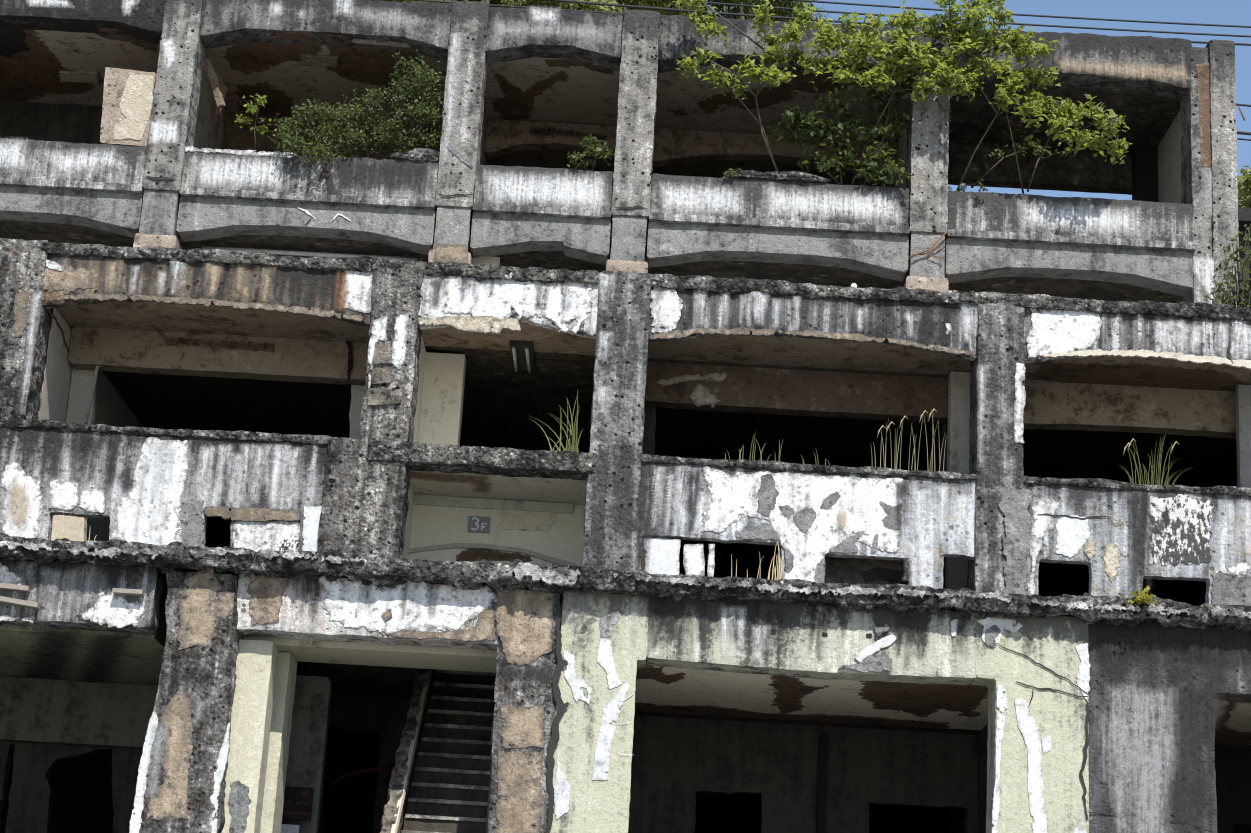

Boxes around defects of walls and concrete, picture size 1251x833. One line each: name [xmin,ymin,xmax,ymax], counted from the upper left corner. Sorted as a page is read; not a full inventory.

peeling [343,243,595,406]
water stain [12,484,28,525]
water stain [43,436,146,490]
water stain [202,447,297,506]
peeling [0,437,592,704]
peeling [600,466,1251,619]
spalling [129,690,194,833]
peeling [580,611,1051,833]
crack [999,645,1156,820]
peeling [1075,642,1091,702]
water stain [1104,627,1251,833]